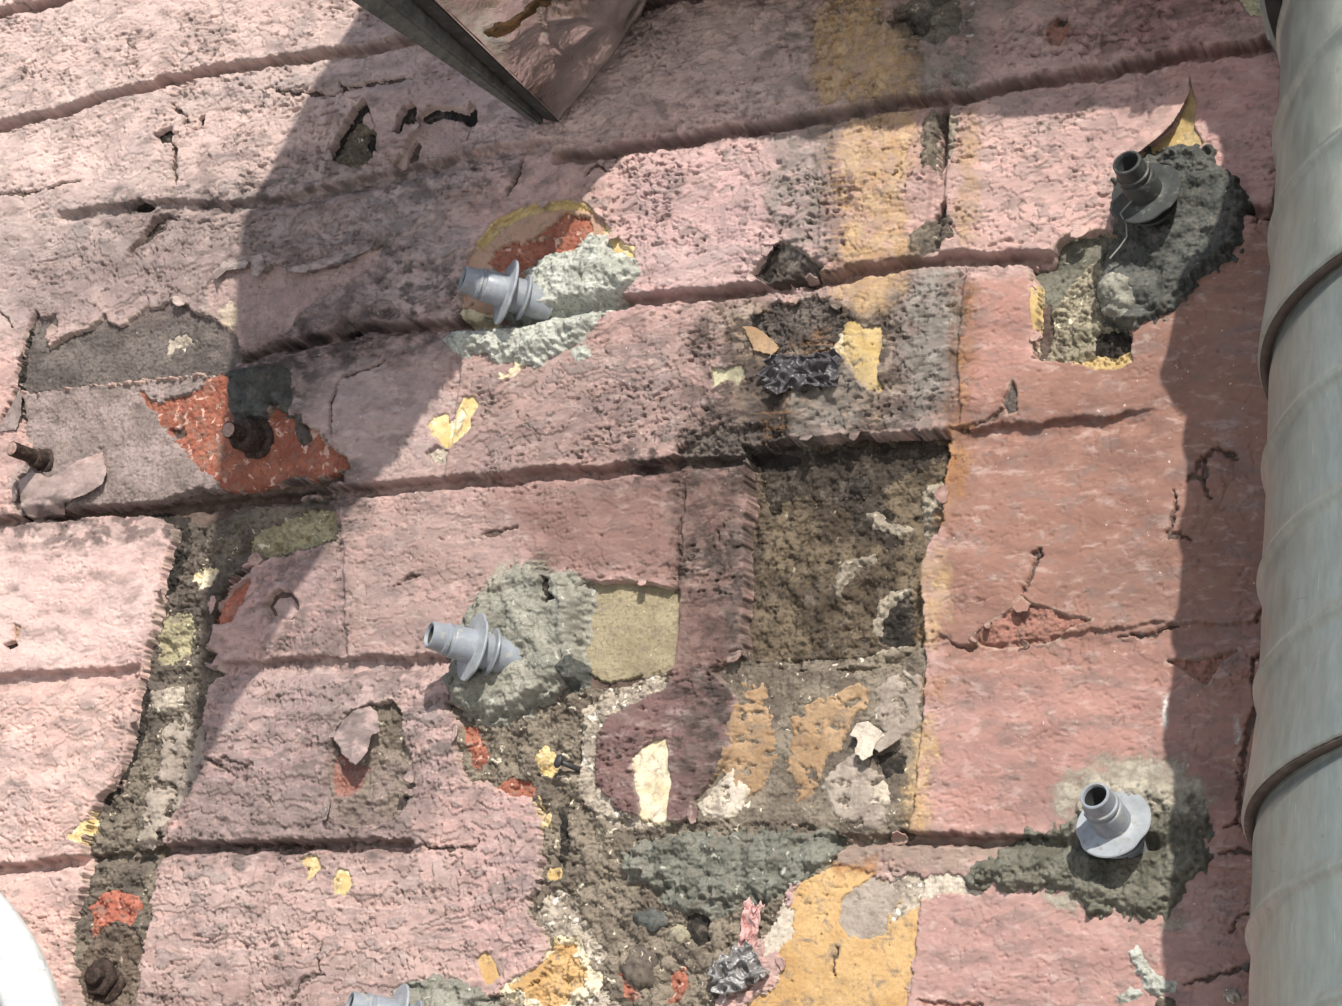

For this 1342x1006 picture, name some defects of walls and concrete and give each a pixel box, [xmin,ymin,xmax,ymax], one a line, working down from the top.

spalling [323,102,377,168]
spalling [397,105,478,171]
peeling [468,199,635,279]
peeling [460,294,502,331]
peeling [742,307,779,355]
spalling [1029,228,1133,370]
peeling [712,365,746,387]
peeling [0,240,382,1006]
crack [928,635,976,652]
spalling [450,429,981,1006]
crack [1221,611,1262,856]
crack [1184,966,1242,986]